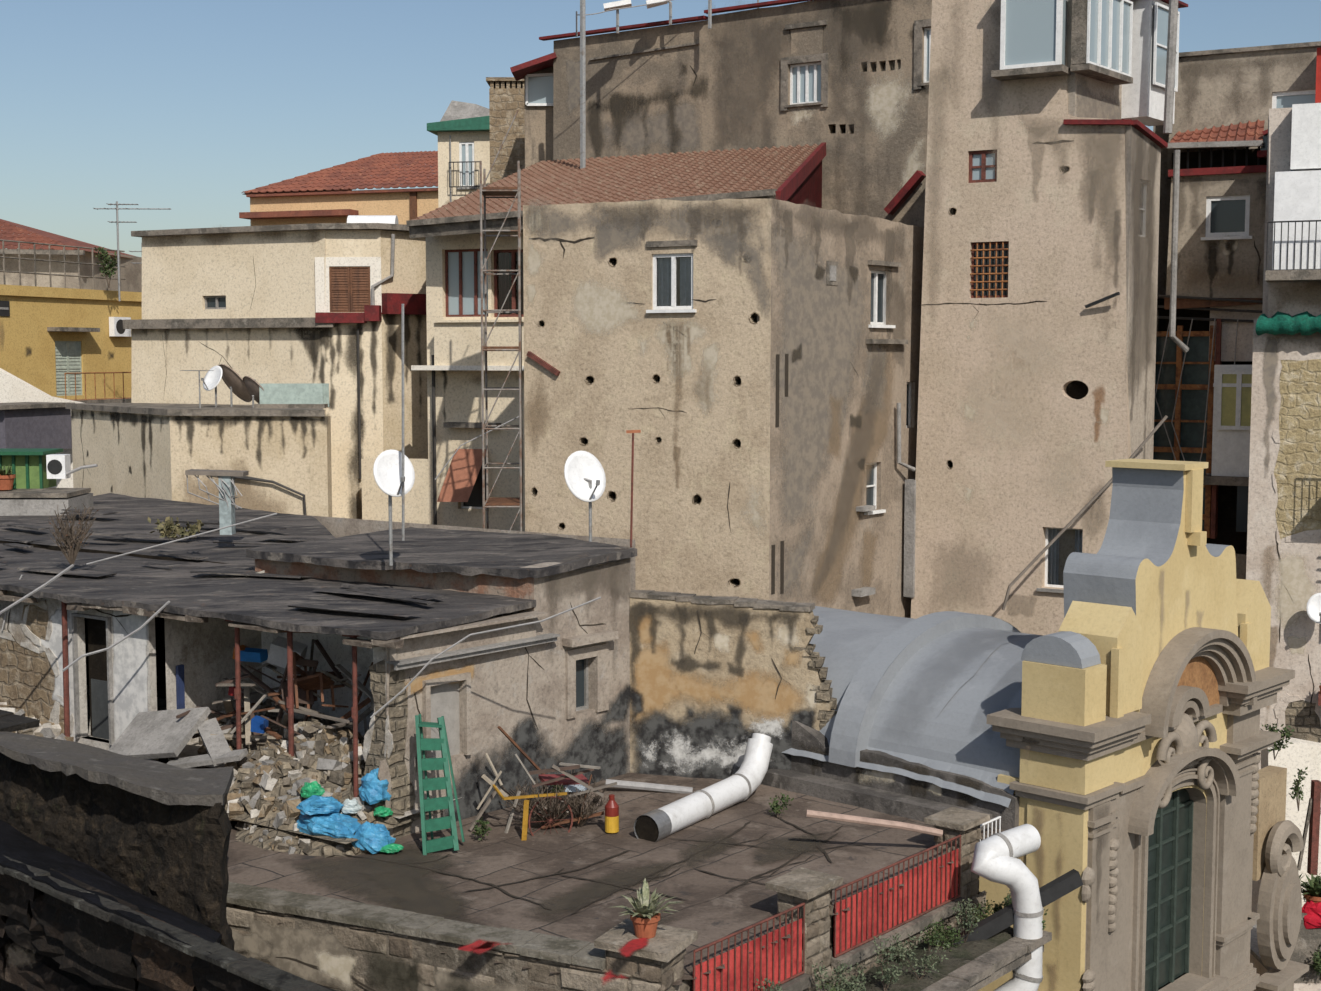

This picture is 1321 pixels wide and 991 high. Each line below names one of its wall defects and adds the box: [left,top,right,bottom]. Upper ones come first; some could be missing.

crack [529,237,595,258]
water stain [71,314,421,519]
rust [1095,388,1103,441]
spalling [1272,359,1321,544]
spalling [0,598,74,735]
crack [525,647,543,729]
peeling [630,613,837,729]
water stain [443,680,815,821]
water stain [808,749,824,775]
crack [342,813,865,915]